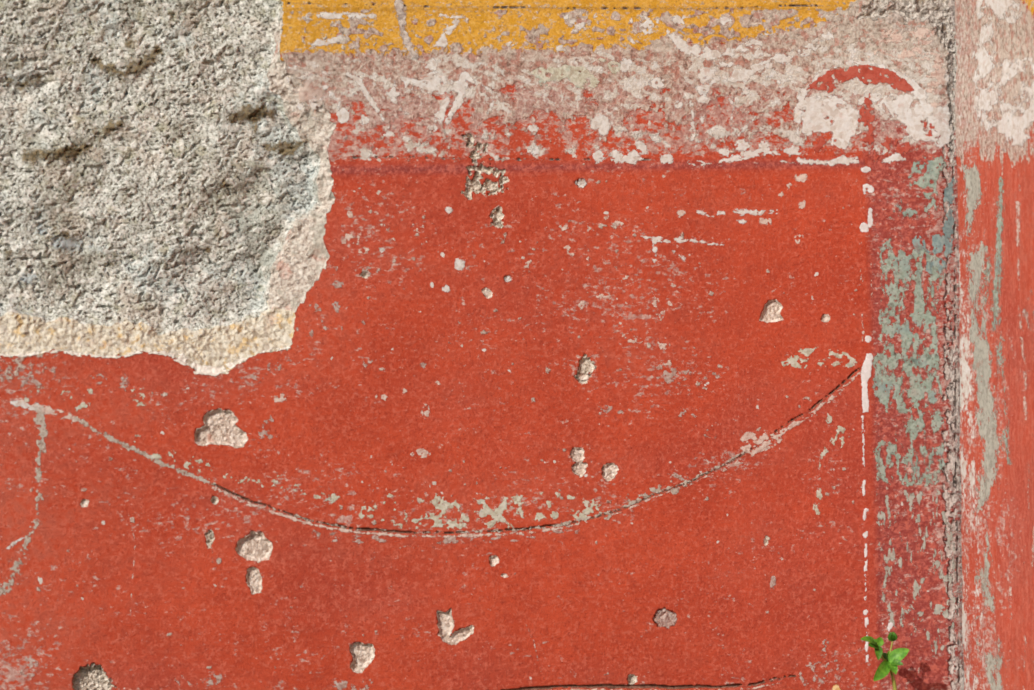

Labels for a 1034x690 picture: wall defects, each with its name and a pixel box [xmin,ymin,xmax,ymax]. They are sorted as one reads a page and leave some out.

peeling [387,13,494,132]
peeling [629,15,834,141]
peeling [971,0,1034,155]
spalling [0,0,385,381]
spalling [461,133,509,228]
peeling [593,141,648,164]
spalling [151,408,340,504]
crack [0,368,861,595]
spalling [235,531,273,594]
spalling [334,642,375,690]
spalling [437,609,474,645]
crack [504,675,796,690]